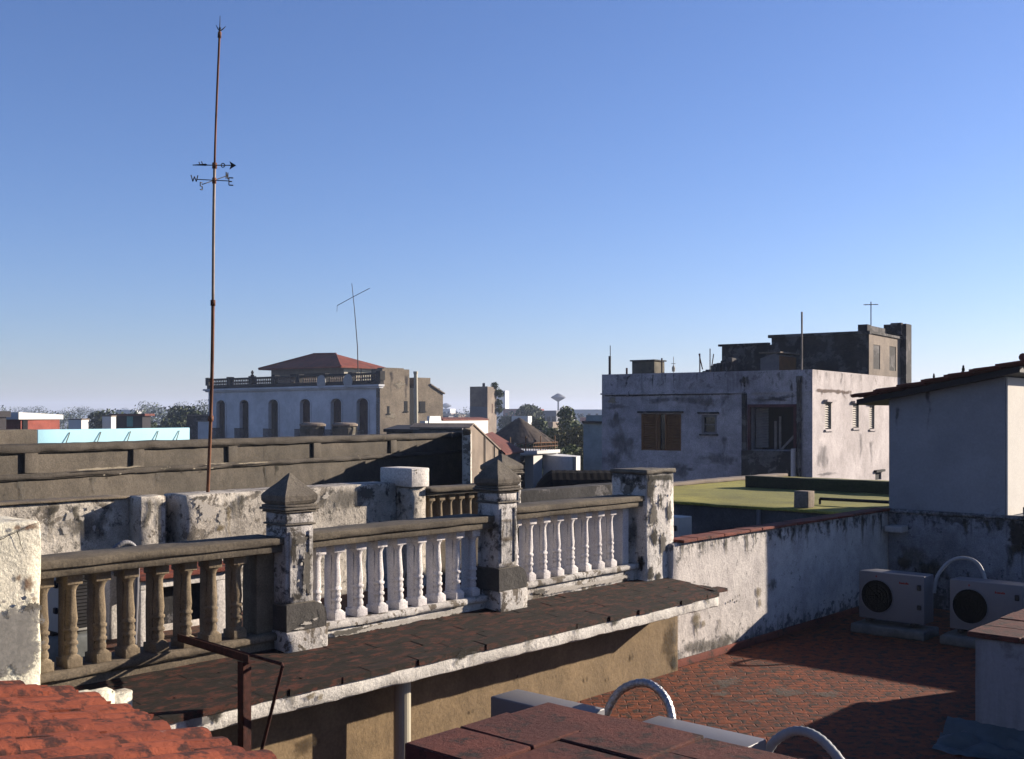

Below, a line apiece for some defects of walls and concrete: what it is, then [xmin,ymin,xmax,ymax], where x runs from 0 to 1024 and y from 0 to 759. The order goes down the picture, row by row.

leakage [621,464,691,488]
peeling [192,496,226,523]
peeling [647,474,673,557]
leakage [984,520,1024,567]
spalling [0,593,45,679]
leakage [666,613,731,669]